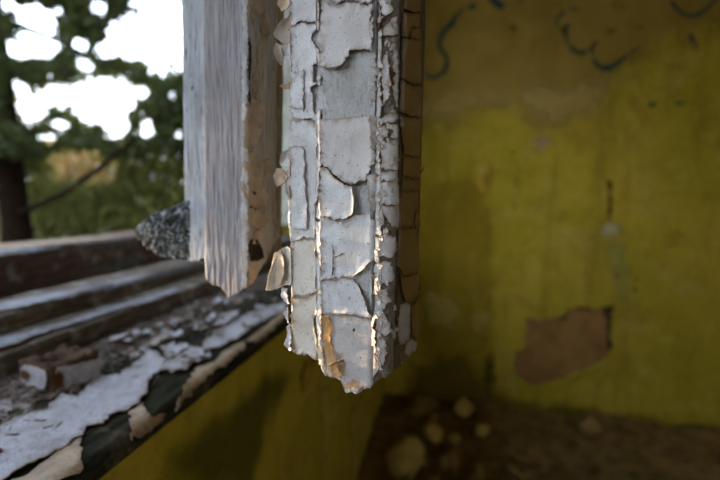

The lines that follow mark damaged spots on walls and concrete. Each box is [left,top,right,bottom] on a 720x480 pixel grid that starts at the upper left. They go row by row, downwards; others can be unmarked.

peeling [0,0,422,480]
spalling [509,306,613,393]